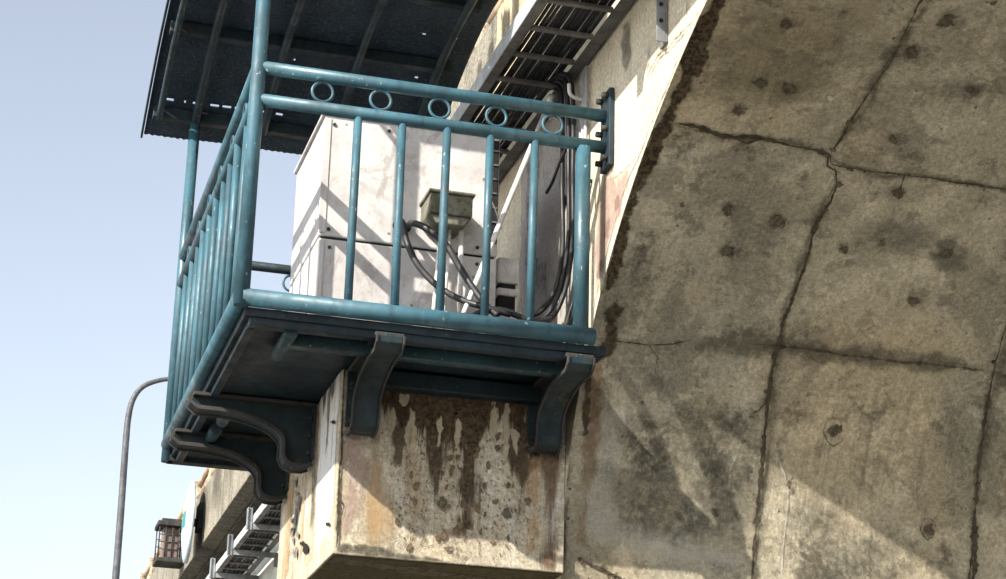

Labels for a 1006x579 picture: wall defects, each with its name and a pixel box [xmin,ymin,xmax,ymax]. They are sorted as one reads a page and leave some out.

crack [647,7,699,76]
water stain [592,0,726,309]
water stain [599,300,623,359]
crack [601,338,689,384]
crack [676,0,1006,579]
rust [530,453,559,570]
crack [578,557,626,579]
water stain [622,409,757,551]
water stain [772,447,893,579]